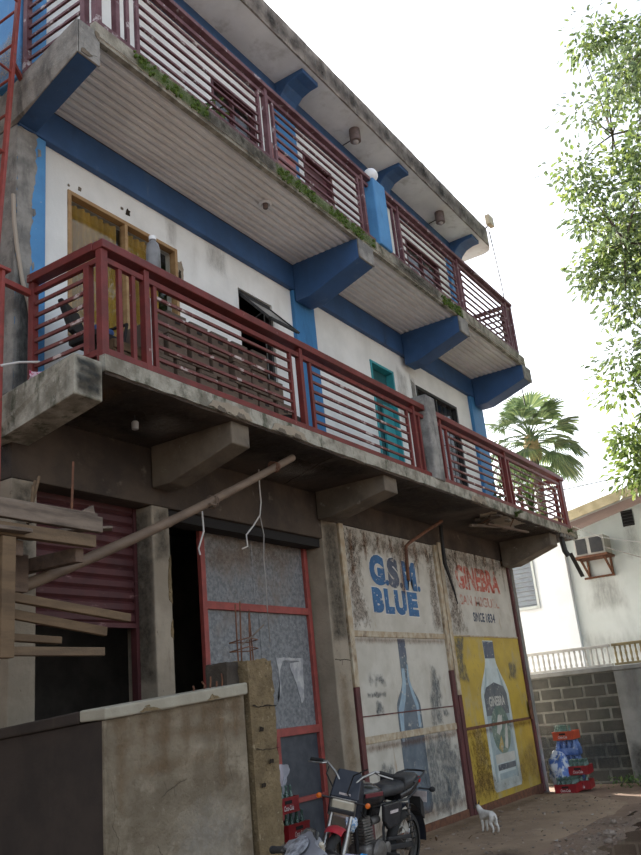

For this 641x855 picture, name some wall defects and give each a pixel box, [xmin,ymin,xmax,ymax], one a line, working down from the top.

peeling [0,125,41,395]